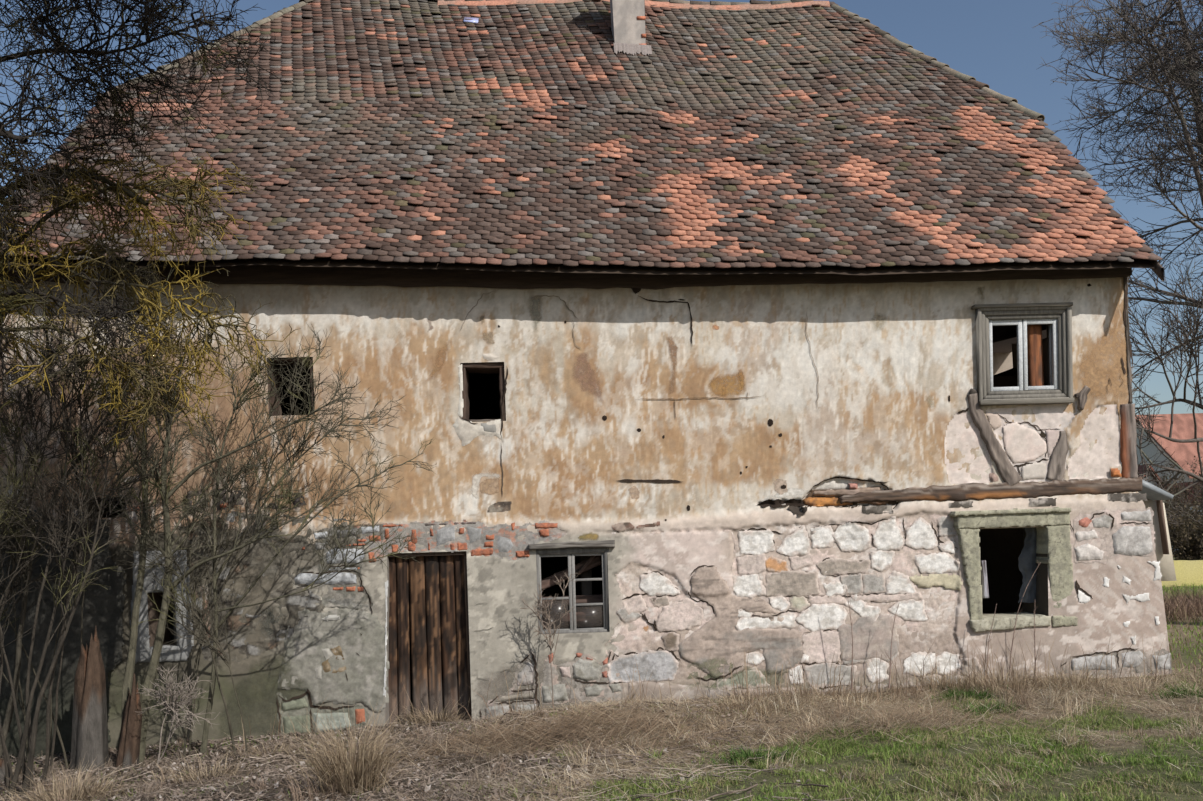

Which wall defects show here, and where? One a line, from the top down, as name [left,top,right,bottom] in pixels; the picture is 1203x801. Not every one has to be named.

crack [631,288,693,343]
damp [668,338,678,392]
flaking render [944,401,1122,484]
spalling [1029,498,1057,507]
flaking render [180,474,567,697]
flaking render [479,478,983,721]
flaking render [1074,493,1162,603]
crack [277,565,372,733]
flaking render [1062,621,1172,675]